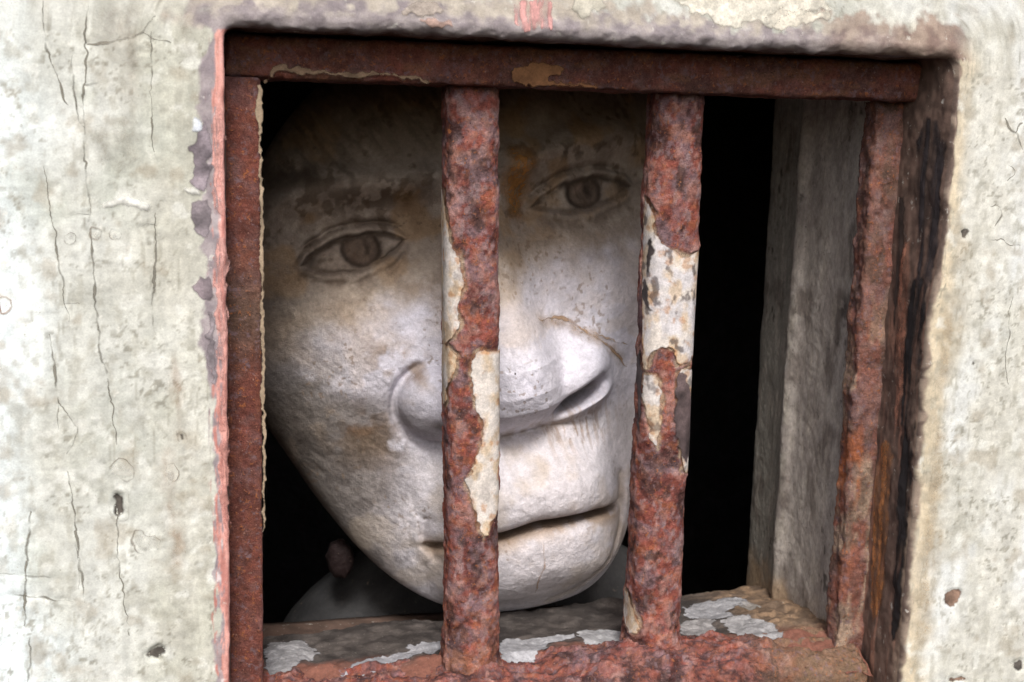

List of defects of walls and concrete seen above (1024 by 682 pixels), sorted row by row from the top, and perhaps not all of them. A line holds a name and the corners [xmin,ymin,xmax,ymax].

crack [42,8,110,110]
crack [21,511,55,660]
crack [49,240,102,427]
crack [150,213,158,294]
peeling [188,109,229,542]
peeling [441,188,464,404]
peeling [465,349,500,536]
corrosion [642,238,655,311]
peeling [641,201,699,445]
corrosion [674,372,691,462]
corrosion [871,441,889,615]
corrosion [895,244,907,427]